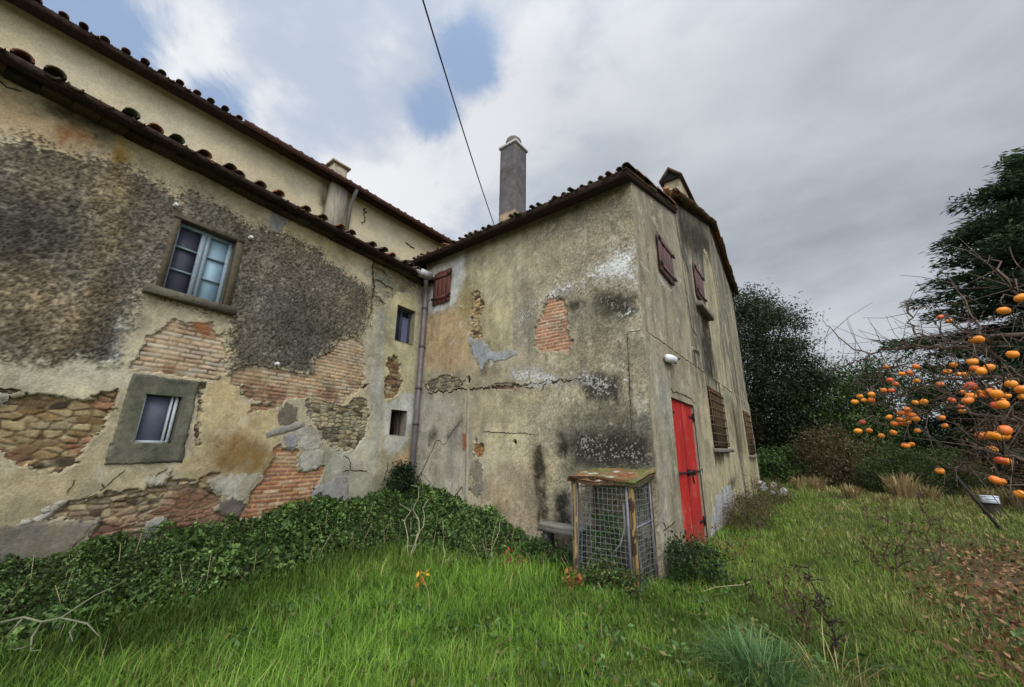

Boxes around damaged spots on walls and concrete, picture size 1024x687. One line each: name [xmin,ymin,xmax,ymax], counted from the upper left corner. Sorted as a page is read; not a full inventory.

crack [367,263,394,320]
spalling [469,291,485,339]
spalling [533,295,575,354]
water stain [521,244,638,319]
spalling [129,319,370,451]
spalling [384,355,403,400]
spalling [0,388,118,474]
spalling [20,444,324,567]
crack [420,426,457,484]
flaking render [469,442,485,497]
water stain [534,445,569,523]
water stain [559,430,650,468]